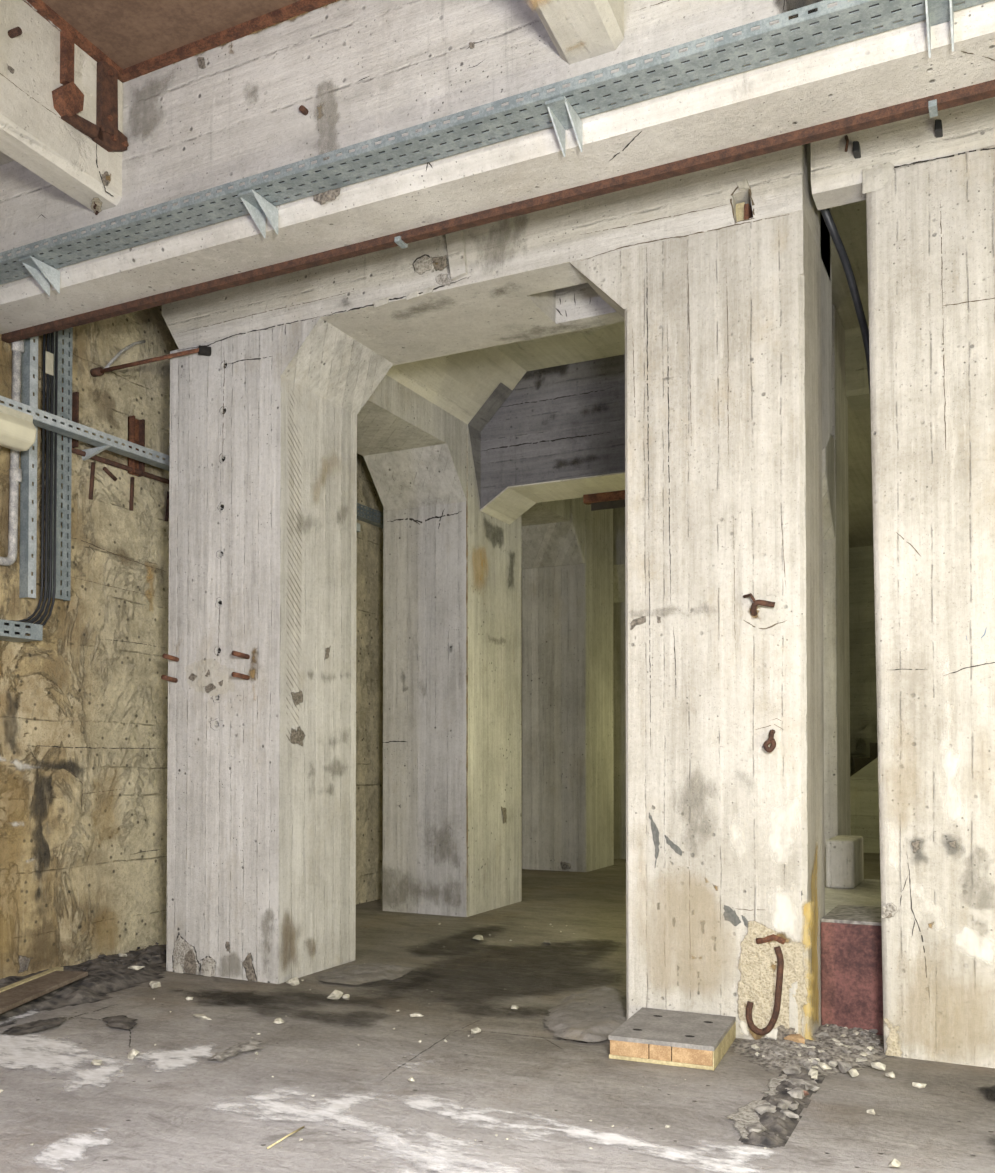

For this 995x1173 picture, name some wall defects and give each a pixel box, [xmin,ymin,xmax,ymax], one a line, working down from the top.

water stain [6,694,22,768]
water stain [33,761,83,899]
spalling [172,934,216,977]
spalling [242,953,257,981]
water stain [284,919,294,959]
water stain [213,927,616,1015]
spalling [737,915,807,1041]
water stain [0,1011,213,1091]
water stain [36,1128,110,1170]
water stain [212,1089,774,1173]